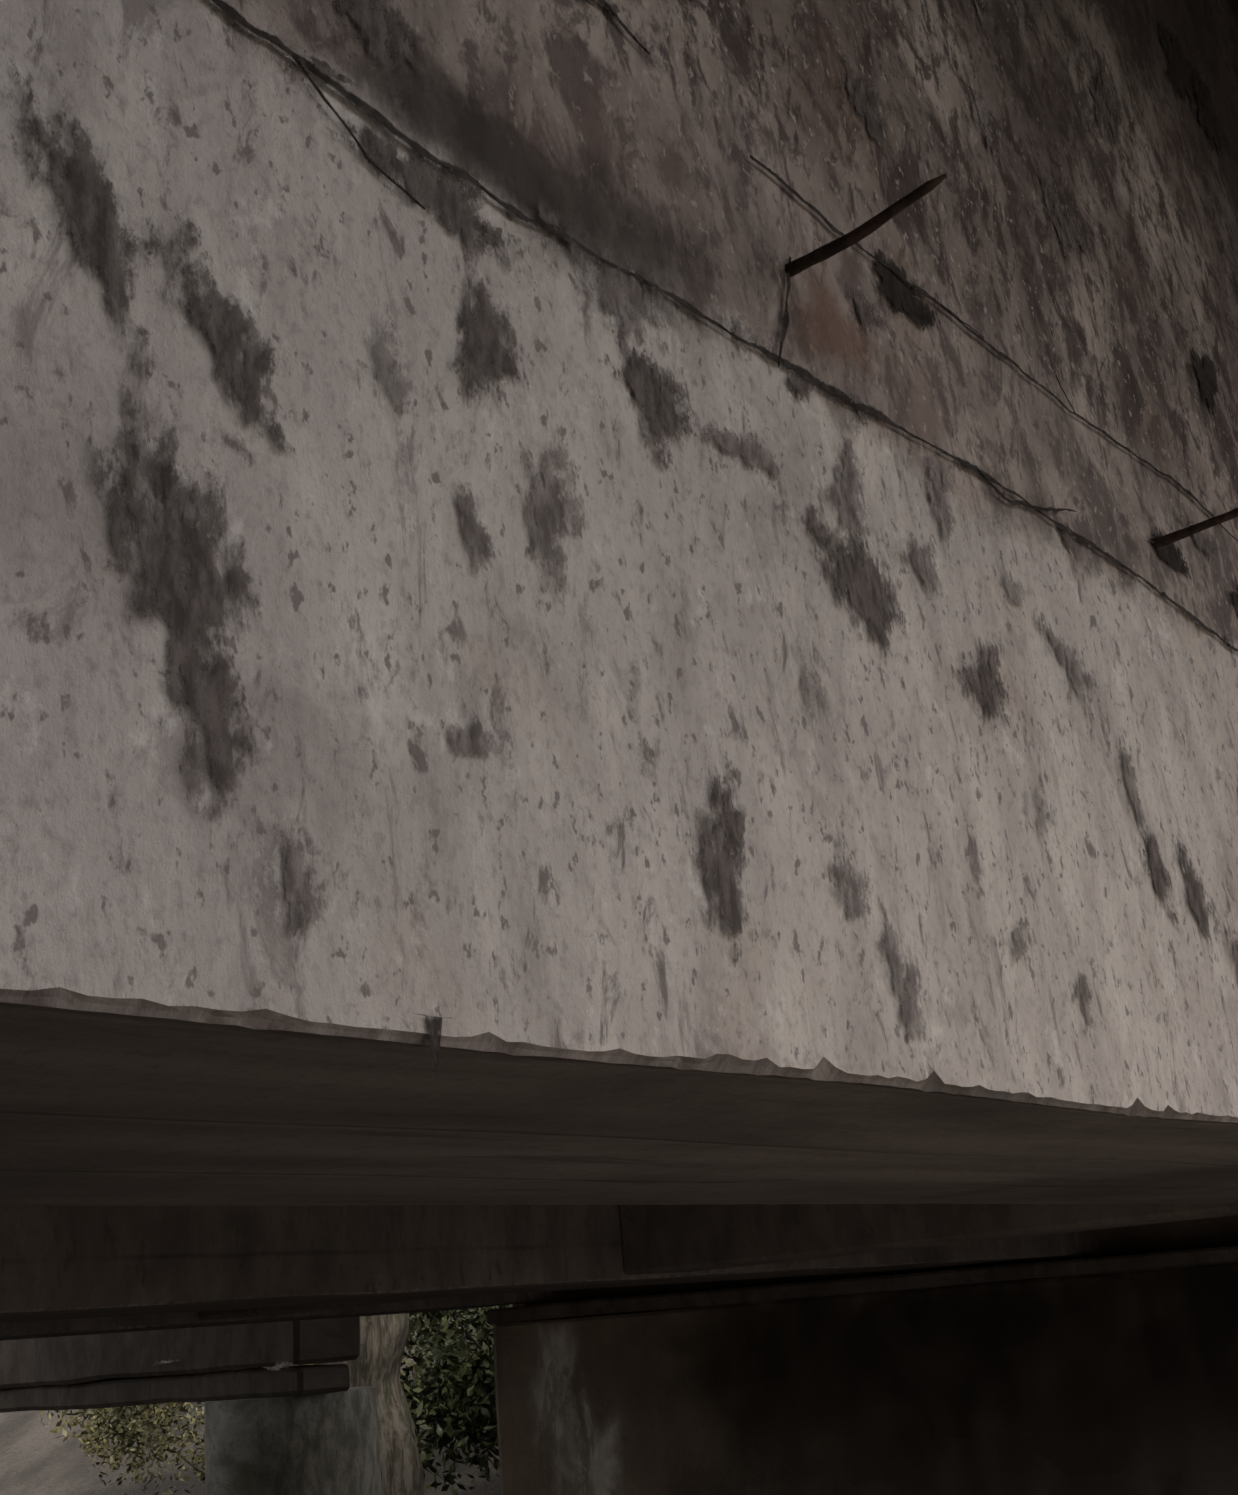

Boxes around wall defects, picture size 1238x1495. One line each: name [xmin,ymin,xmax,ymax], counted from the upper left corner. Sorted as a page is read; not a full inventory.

leakage [13,65,295,452]
leakage [386,73,783,481]
crack [212,0,1238,652]
spalling [846,249,940,332]
leakage [88,388,261,818]
leakage [457,484,494,574]
peeling [800,426,955,658]
peeling [953,639,1010,728]
spalling [1146,516,1221,579]
leakage [697,752,757,961]
leakage [1119,738,1238,963]
spalling [0,987,1238,1123]